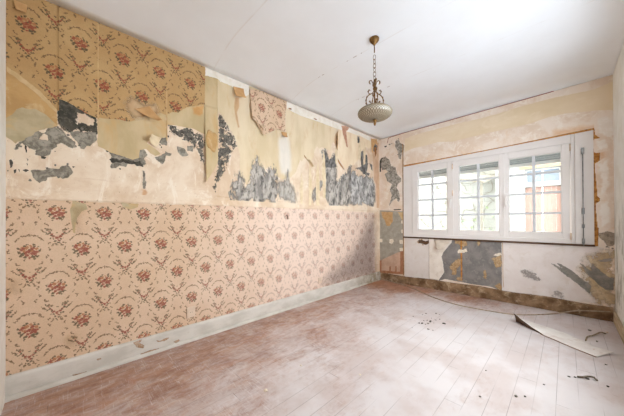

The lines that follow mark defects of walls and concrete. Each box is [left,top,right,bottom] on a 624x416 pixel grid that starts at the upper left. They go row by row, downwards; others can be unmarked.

flaking render [7,99,98,183]
flaking render [106,149,147,189]
flaking render [155,125,205,165]
flaking render [213,115,237,192]
flaking render [229,102,404,226]
peeling [404,113,615,303]